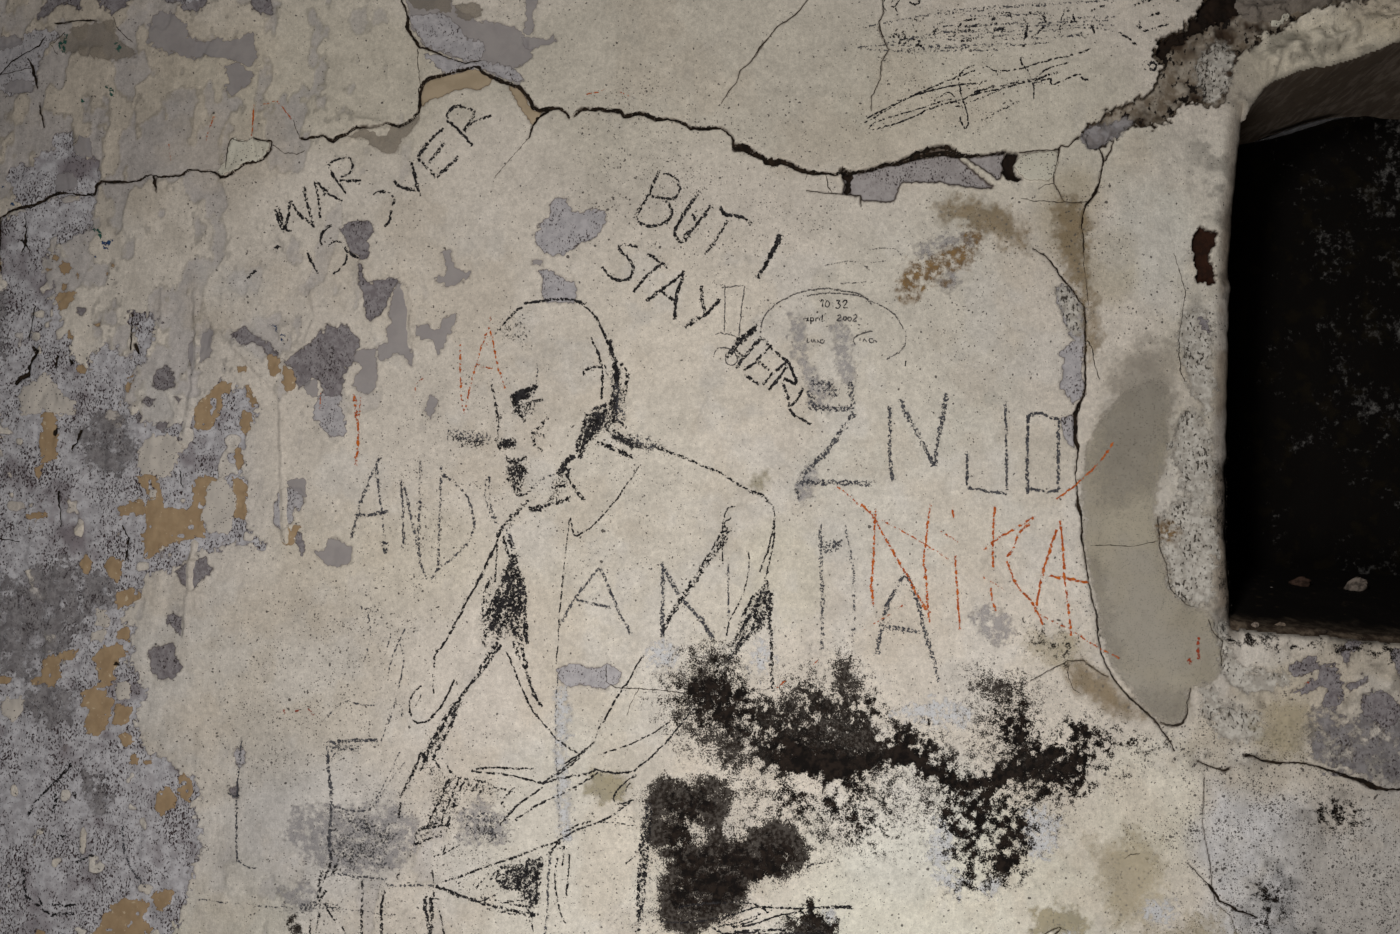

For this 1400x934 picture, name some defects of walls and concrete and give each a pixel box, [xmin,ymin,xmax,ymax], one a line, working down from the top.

flaking render [348,0,556,154]
flaking render [1077,0,1350,150]
flaking render [231,220,456,437]
flaking render [532,198,607,304]
crack [0,0,1223,751]
flaking render [842,151,1059,203]
flaking render [0,131,352,934]
damp [585,617,1174,934]
crack [1187,753,1400,934]
flaking render [1198,621,1400,782]